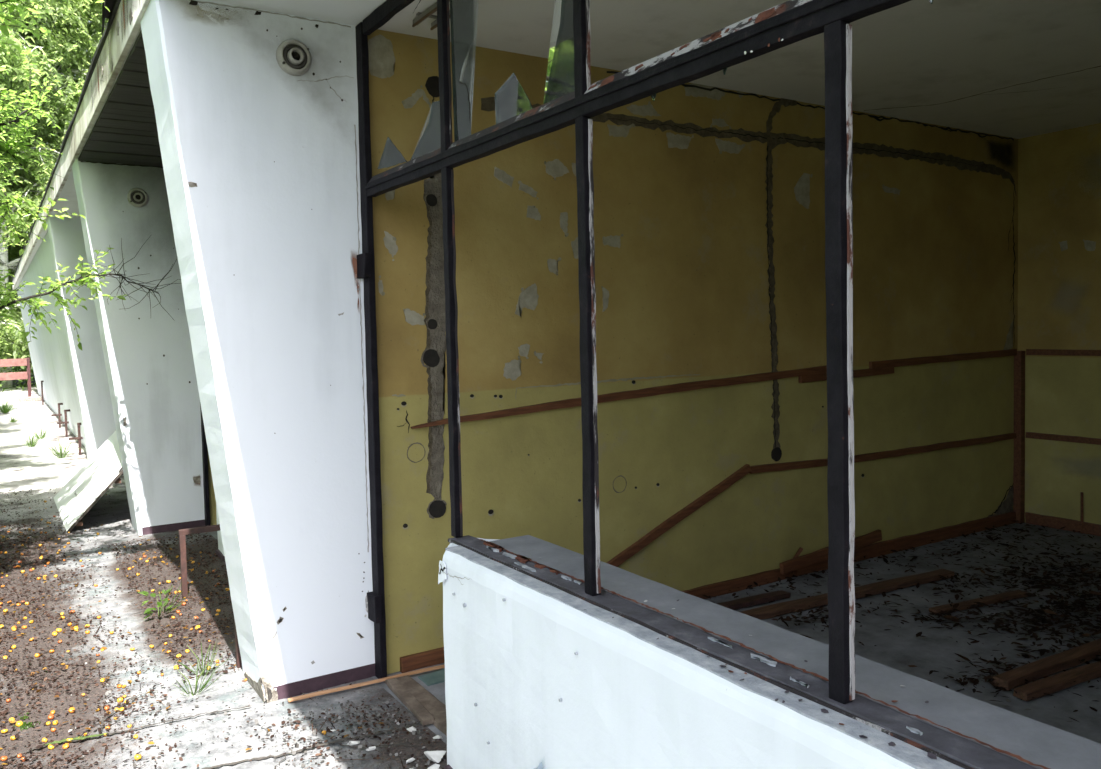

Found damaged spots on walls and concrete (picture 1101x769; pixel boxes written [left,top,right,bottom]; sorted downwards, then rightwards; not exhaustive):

peeling [515,283,539,317]
peeling [503,344,544,381]
rust [479,539,585,583]
rust [601,587,829,681]
rust [855,690,1050,769]